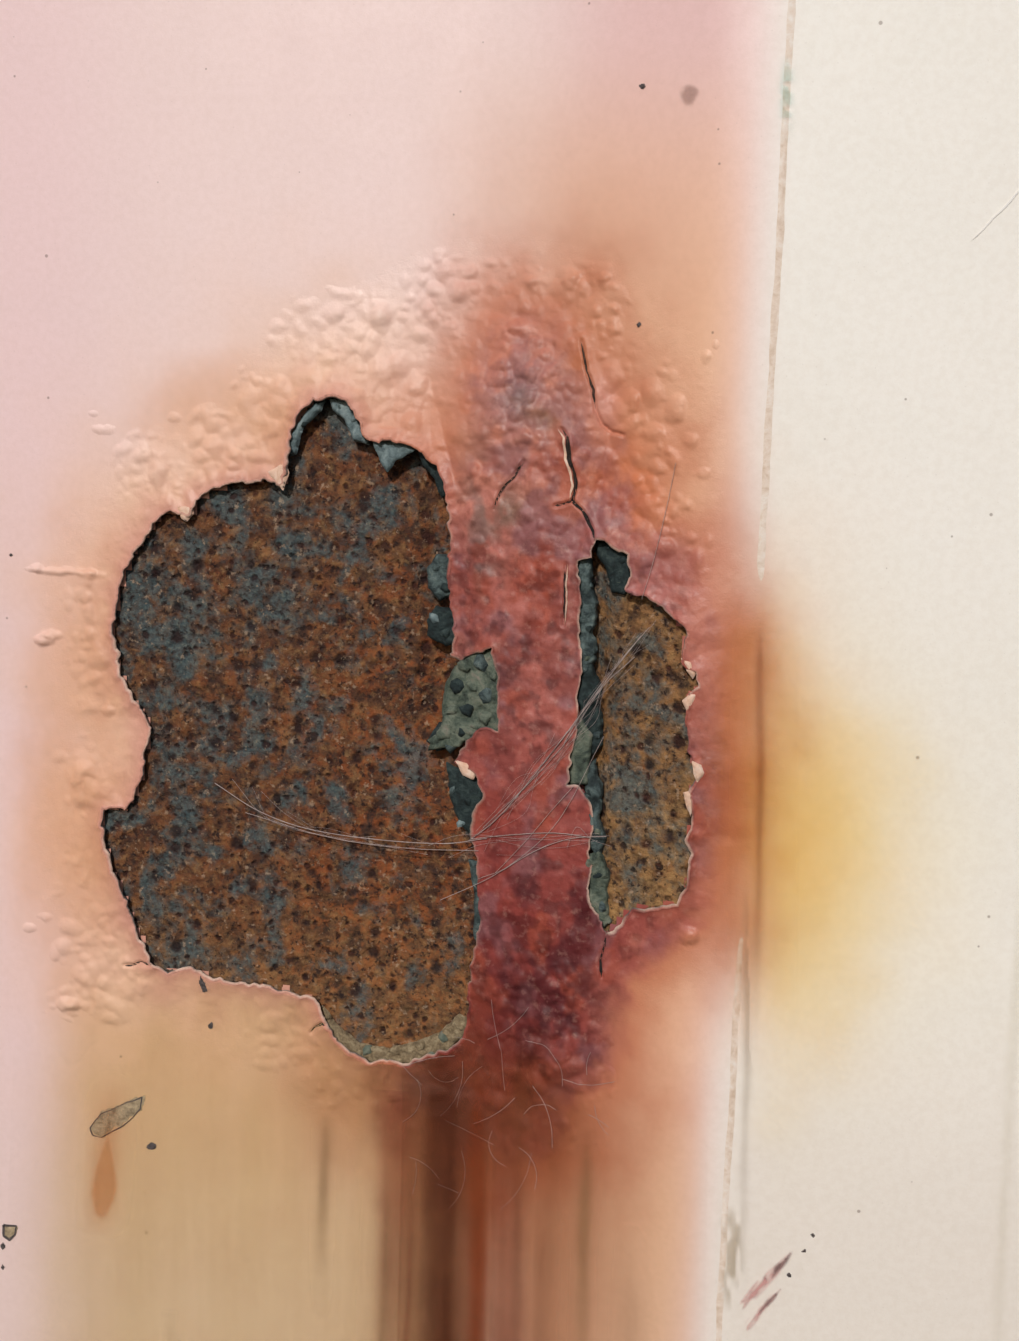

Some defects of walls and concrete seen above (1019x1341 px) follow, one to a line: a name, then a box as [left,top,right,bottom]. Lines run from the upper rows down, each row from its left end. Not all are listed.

crack [555,430,594,538]
crack [581,343,596,410]
peeling [99,393,501,1067]
peeling [564,537,704,936]